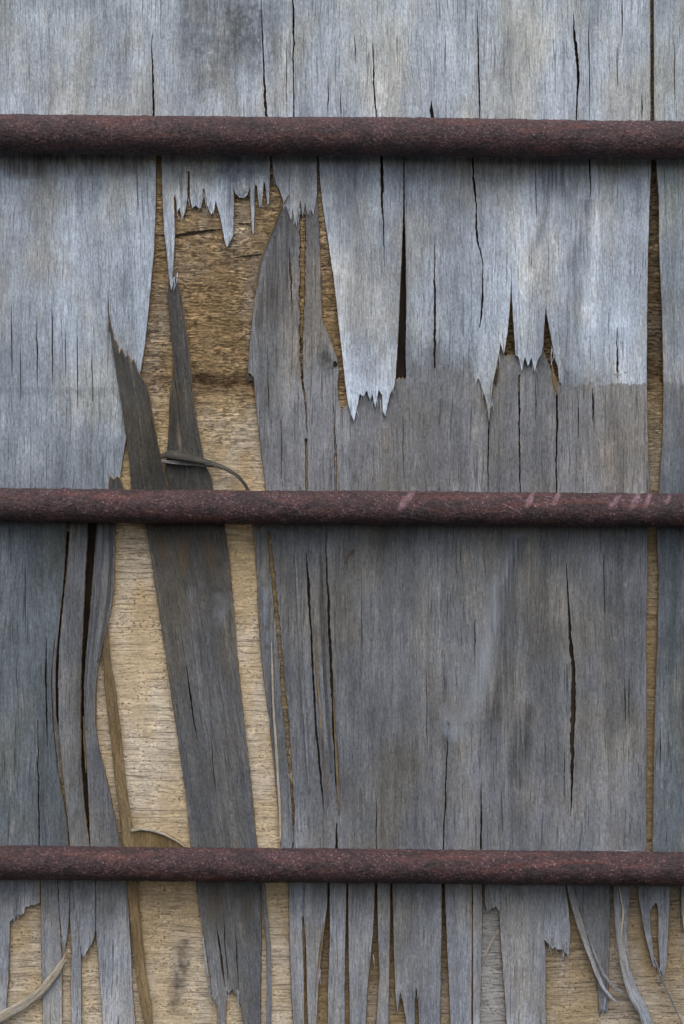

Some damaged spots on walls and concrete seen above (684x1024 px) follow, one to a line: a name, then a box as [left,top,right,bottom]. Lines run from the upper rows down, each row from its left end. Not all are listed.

crack [573,14,590,120]
peeling [107,155,404,490]
crack [380,156,406,379]
crack [472,157,484,328]
peeling [58,522,185,848]
crack [564,562,576,816]
peeling [0,880,136,1024]
peeling [288,882,610,1024]
peeling [637,885,684,979]